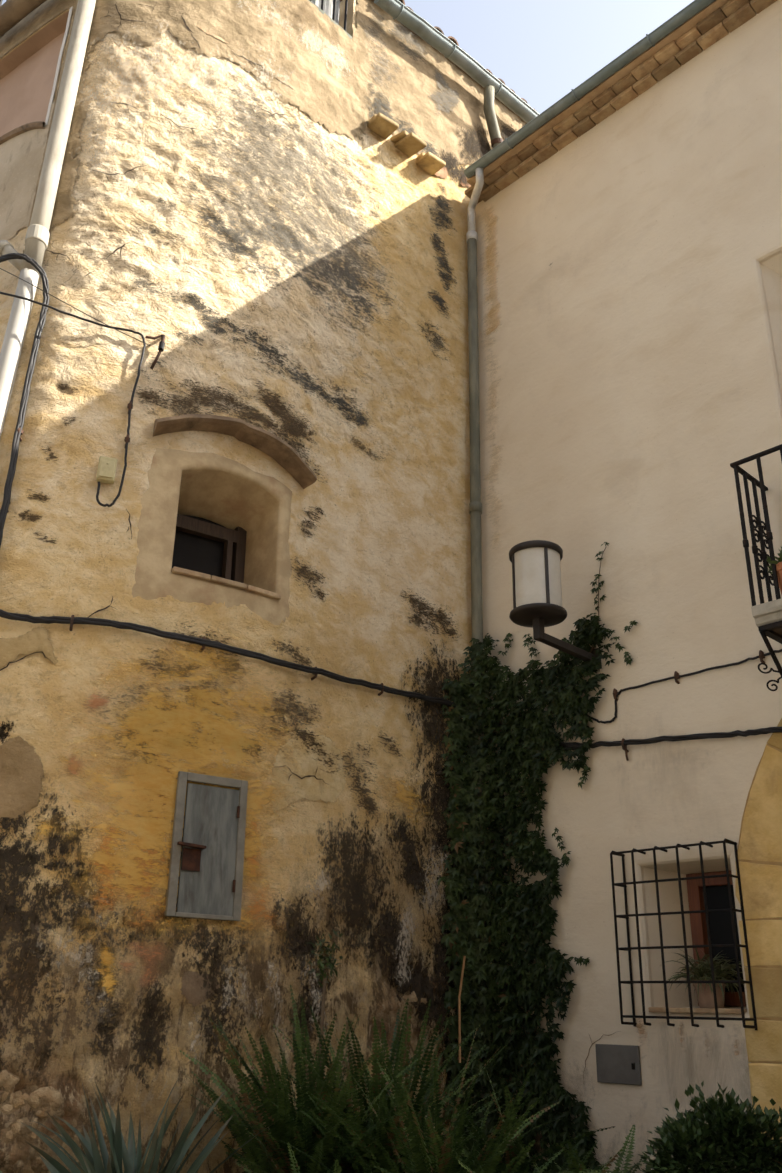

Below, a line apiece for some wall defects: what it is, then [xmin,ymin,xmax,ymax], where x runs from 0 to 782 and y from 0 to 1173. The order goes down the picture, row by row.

crack [104,2,154,27]
crack [108,101,201,135]
crack [181,16,294,121]
spalling [435,167,471,187]
damp [118,221,186,248]
damp [178,167,377,322]
spalling [55,383,78,395]
damp [128,274,383,461]
damp [0,588,466,1090]
spalling [0,1070,77,1173]